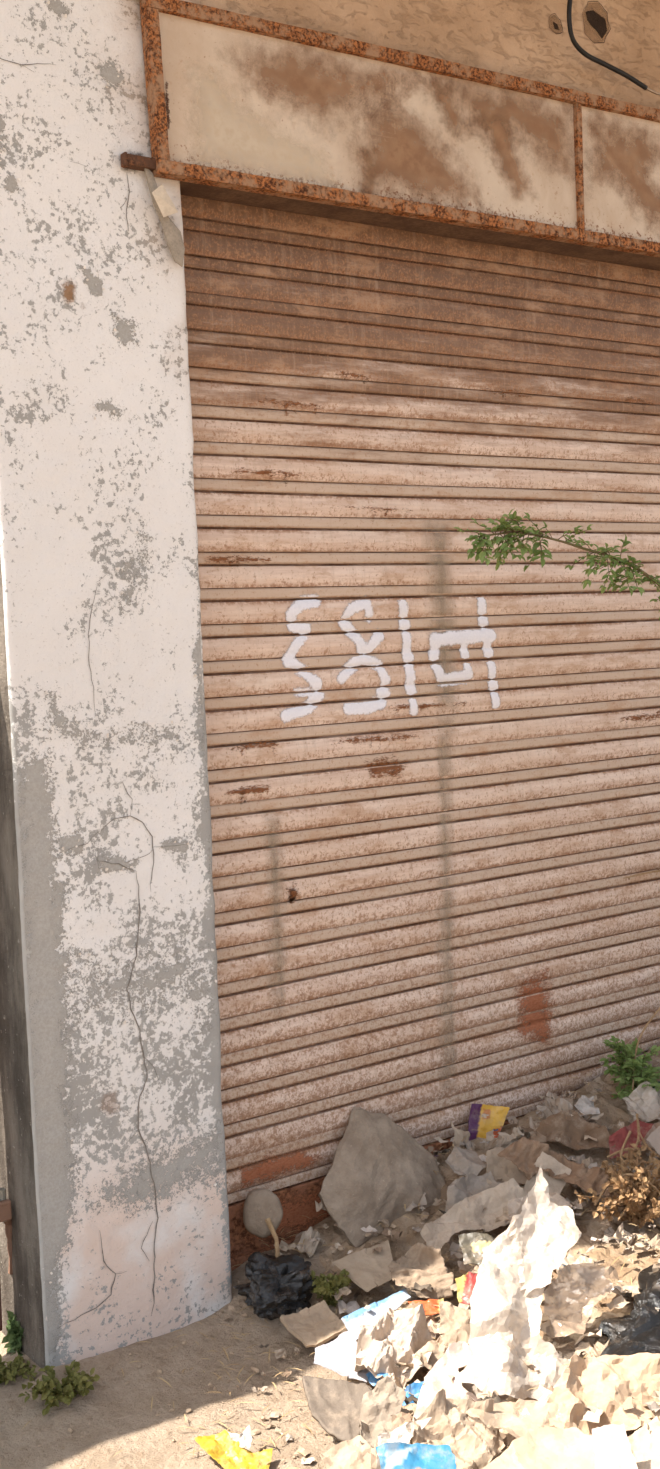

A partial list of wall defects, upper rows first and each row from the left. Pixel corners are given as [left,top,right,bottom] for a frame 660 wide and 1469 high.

peeling [44,0,72,19]
peeling [97,57,125,91]
peeling [3,173,23,193]
peeling [79,264,139,350]
peeling [92,400,127,420]
peeling [111,512,153,618]
peeling [16,569,226,1363]
corrosion [517,971,555,1050]
crack [57,782,186,1329]
corrosion [240,1150,321,1190]
corrosion [247,1191,330,1241]